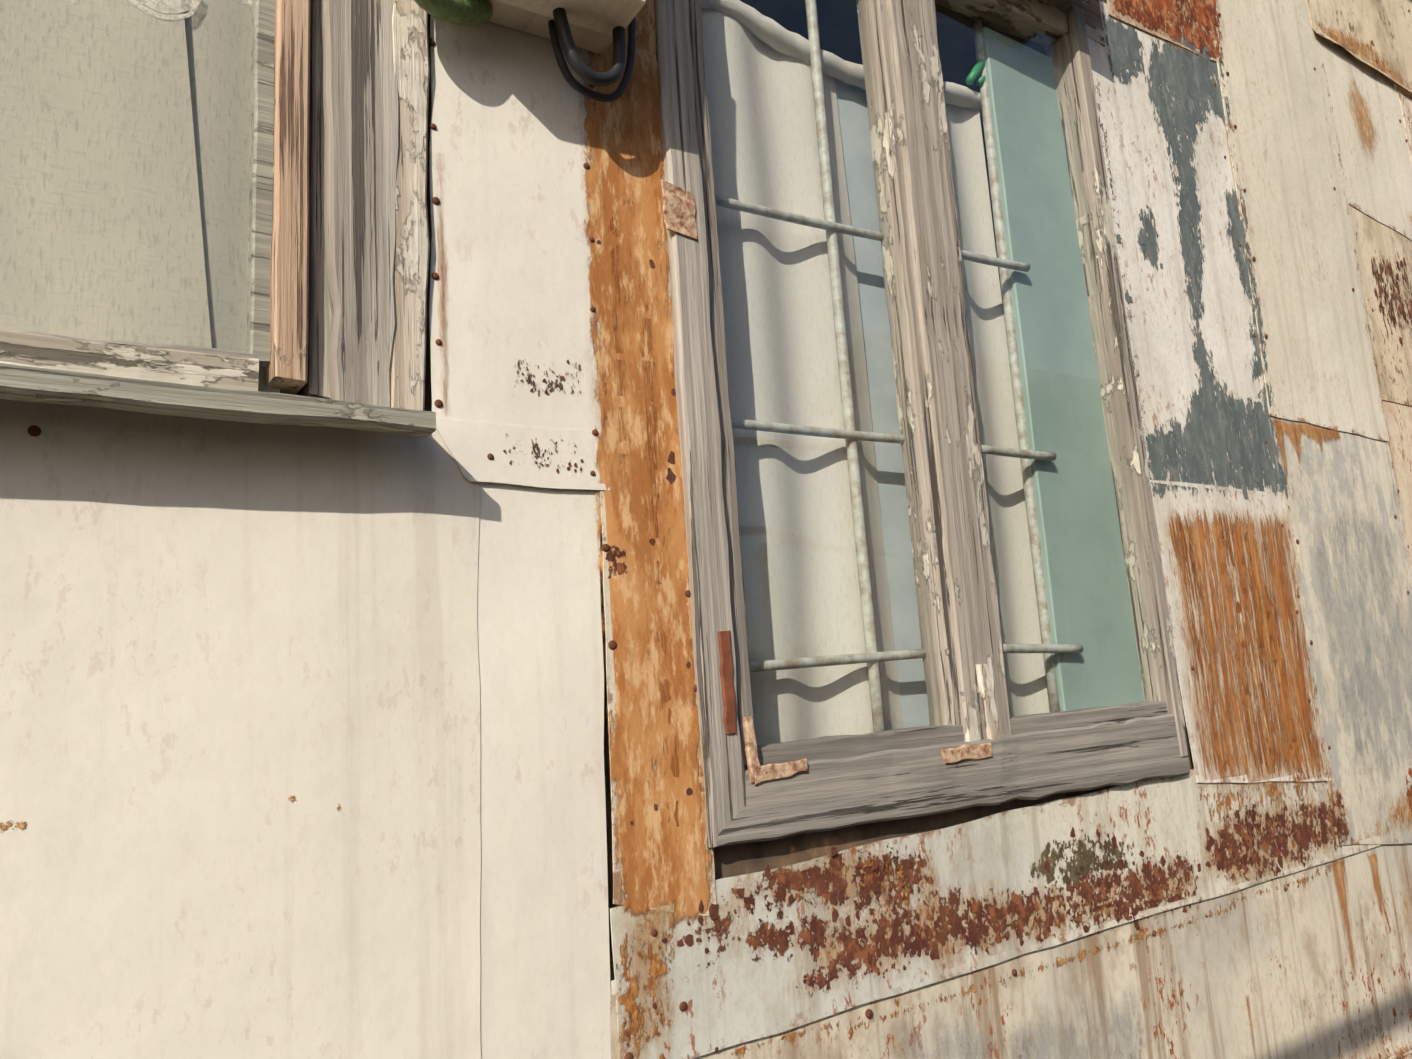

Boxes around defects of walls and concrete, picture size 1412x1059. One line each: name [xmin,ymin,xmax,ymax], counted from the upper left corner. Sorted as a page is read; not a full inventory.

rust [1114,0,1225,70]
peeling [1095,12,1288,499]
rust [1371,251,1412,346]
rust [1169,506,1334,799]
rust [0,820,27,833]
rust [1367,768,1412,838]
rust [1368,855,1382,914]
rust [659,859,1355,1059]